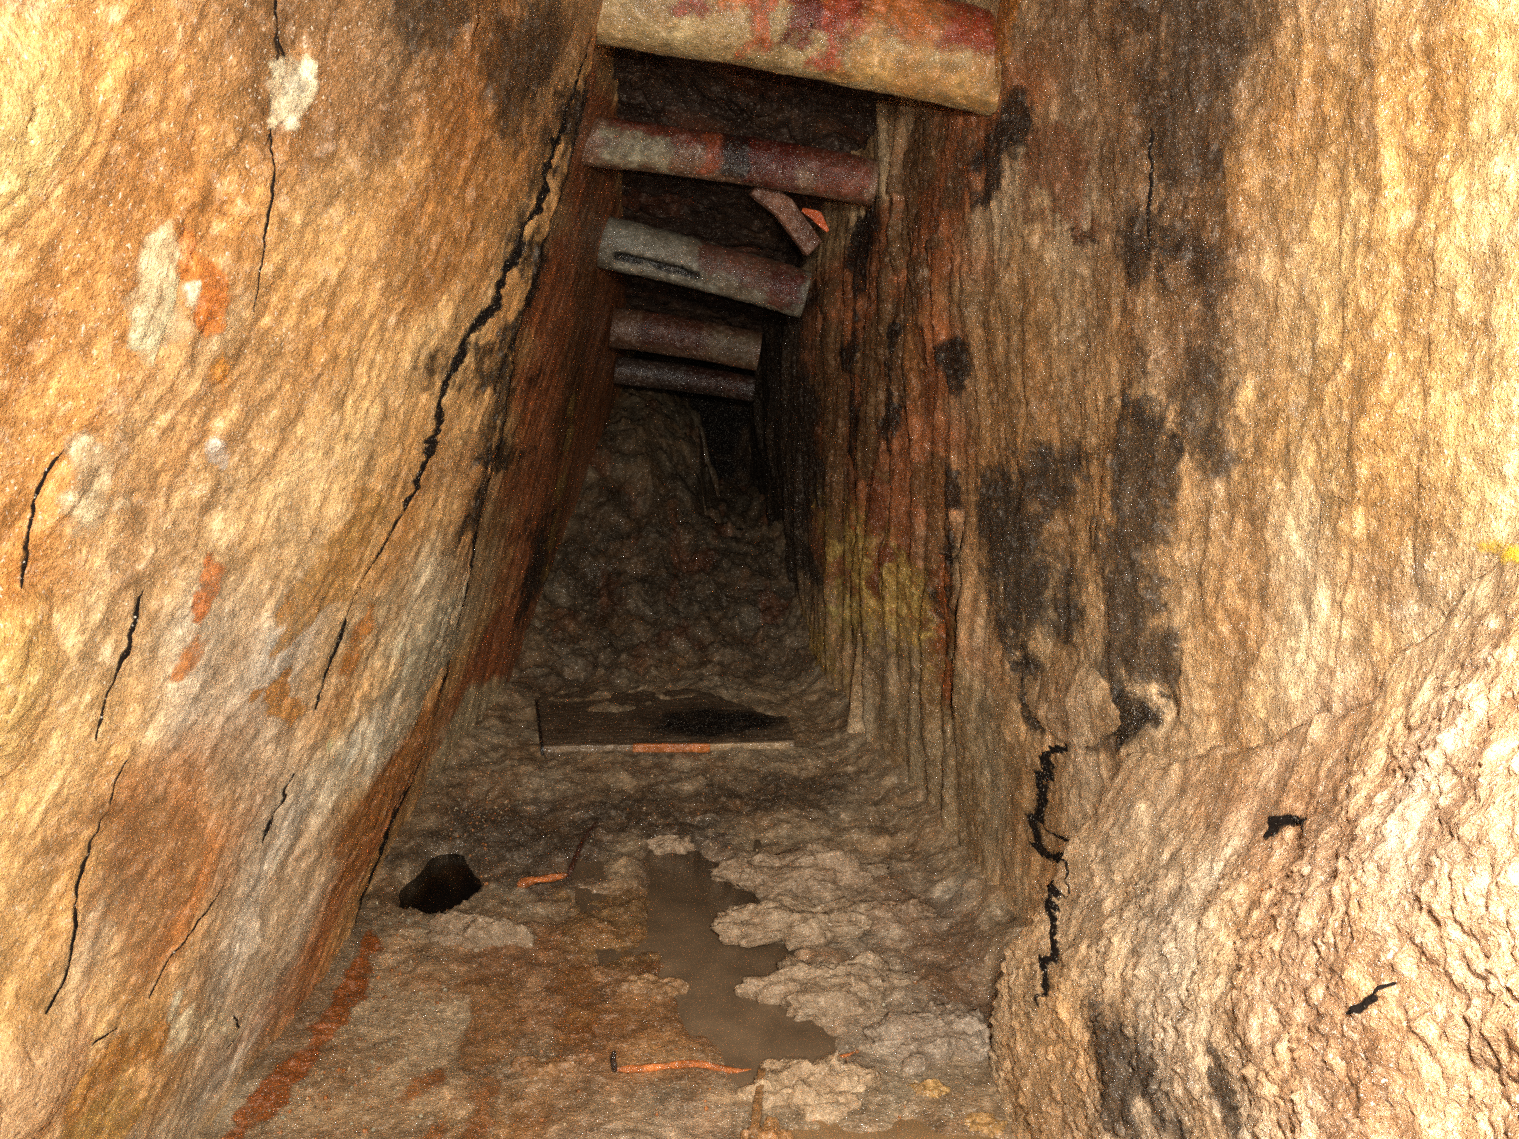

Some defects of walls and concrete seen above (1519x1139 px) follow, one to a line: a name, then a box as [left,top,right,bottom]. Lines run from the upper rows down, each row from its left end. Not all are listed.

crack [253,0,286,312]
damp [961,87,1035,210]
crack [355,421,504,922]
crack [315,35,593,710]
rust [540,166,607,583]
damp [976,443,1090,733]
damp [1092,209,1239,698]
crack [1024,742,1070,1009]
rust [61,1011,172,1139]
rust [221,930,384,1139]
damp [1090,1002,1185,1139]
damp [1206,1047,1241,1136]